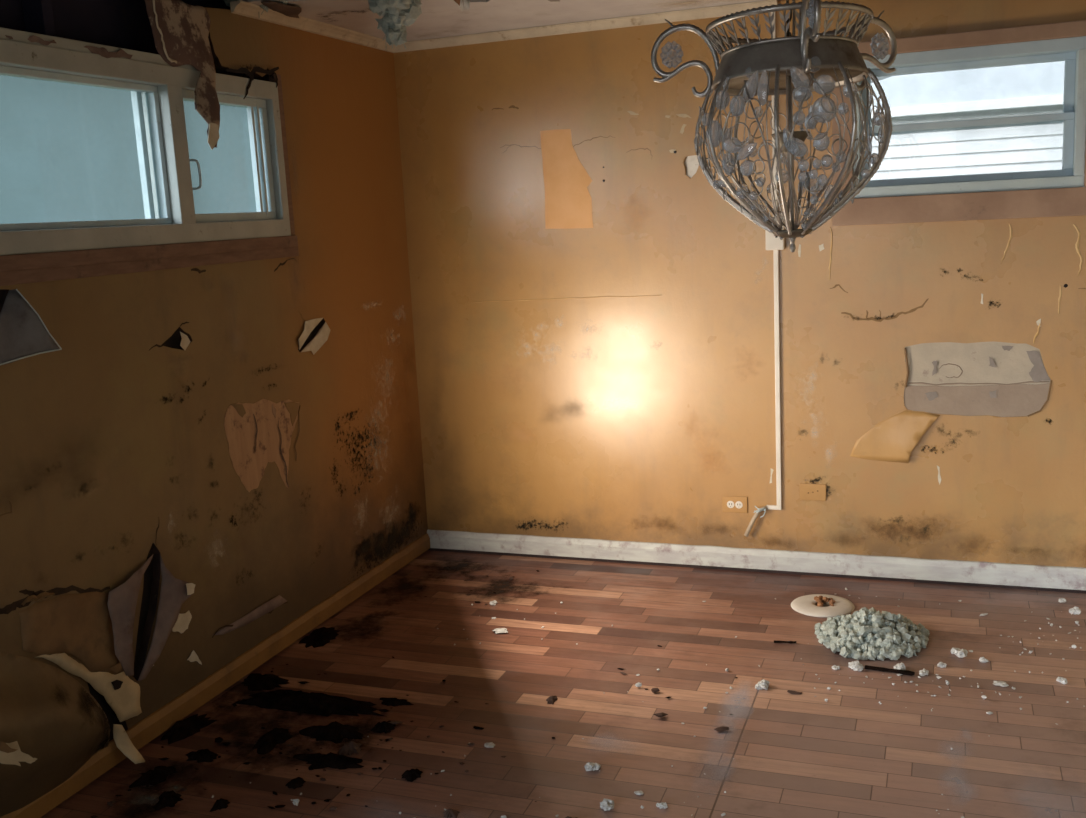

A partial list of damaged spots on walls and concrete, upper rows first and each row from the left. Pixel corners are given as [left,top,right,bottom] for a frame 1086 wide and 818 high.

peeling [261,1,302,18]
crack [830,284,928,322]
spalling [904,341,1052,417]
peeling [224,399,300,492]
damp [331,409,382,496]
crack [0,585,110,614]
peeling [19,592,145,764]
peeling [0,741,37,766]